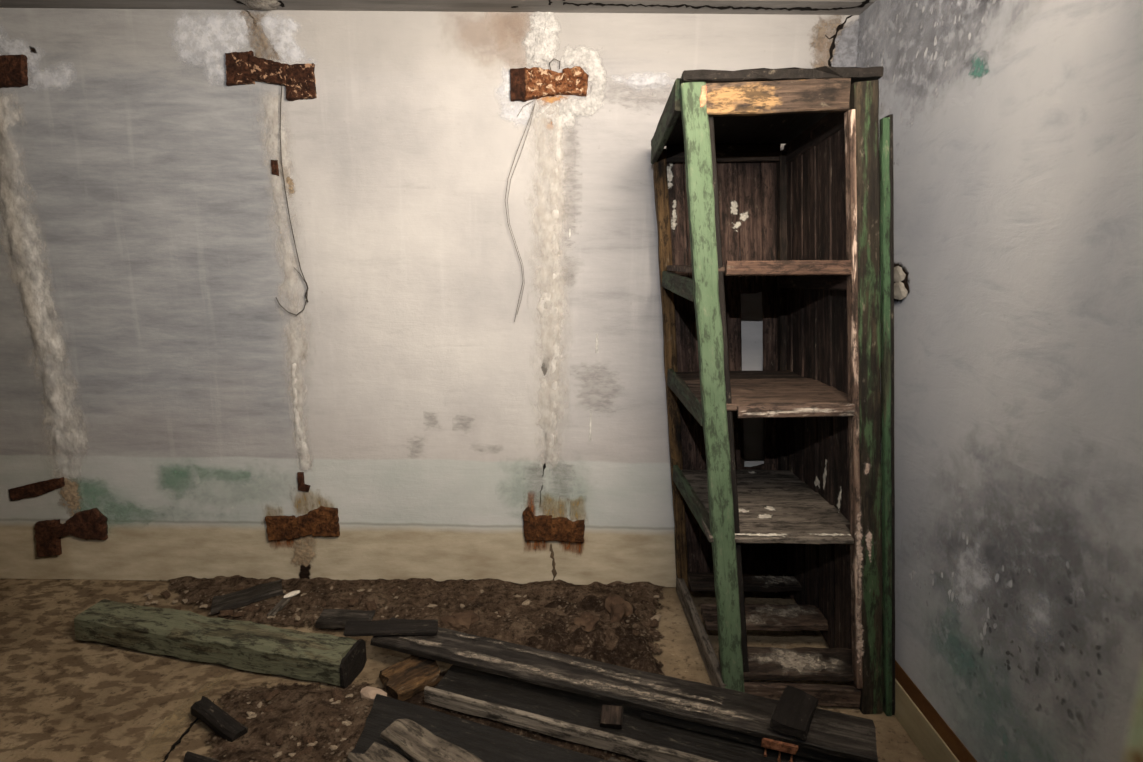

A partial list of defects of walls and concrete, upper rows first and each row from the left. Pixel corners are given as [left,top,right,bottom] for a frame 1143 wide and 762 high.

crack [234,0,257,26]
crack [548,0,870,67]
rust [528,494,582,520]
rust [526,540,584,554]